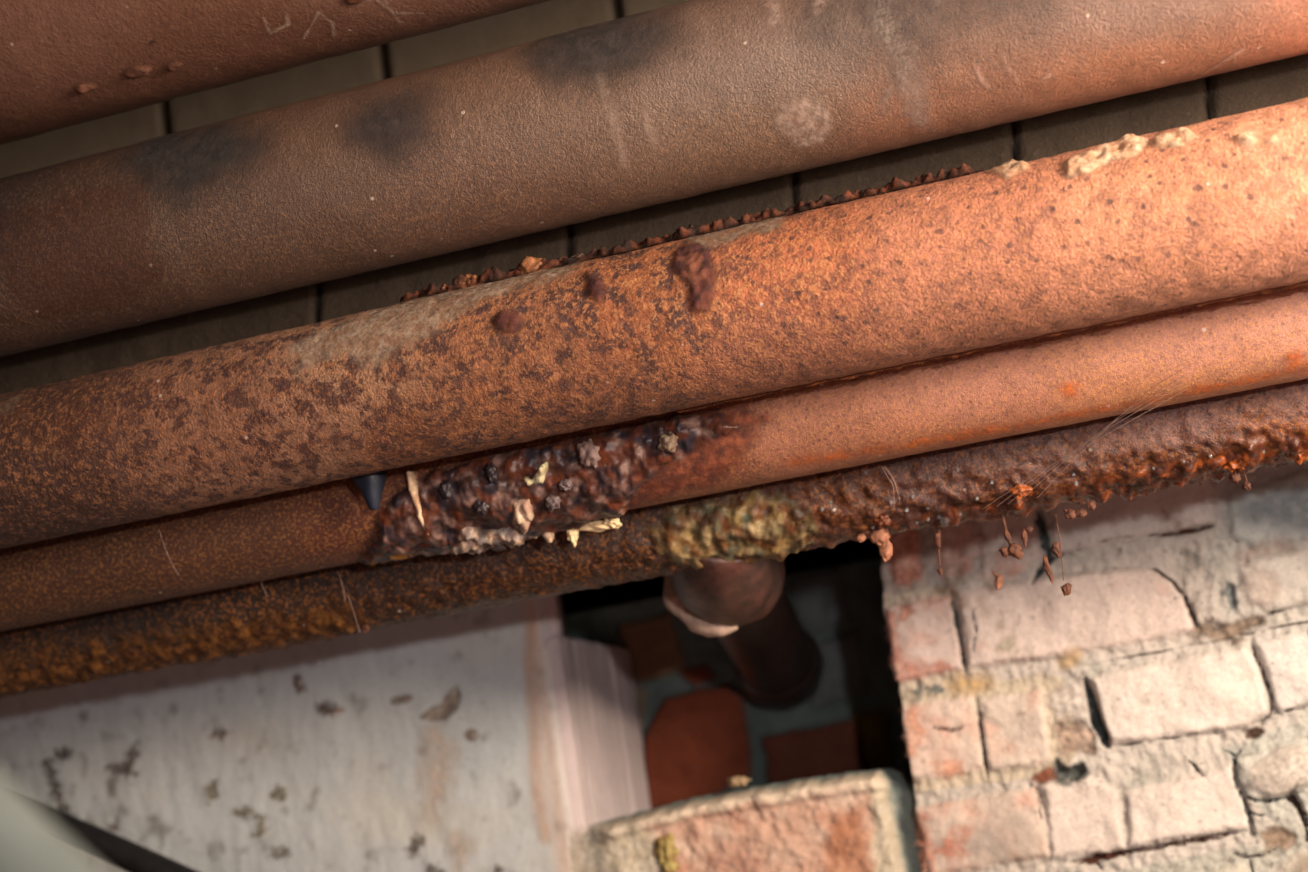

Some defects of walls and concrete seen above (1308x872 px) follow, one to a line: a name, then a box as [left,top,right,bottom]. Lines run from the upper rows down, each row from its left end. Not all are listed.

rust [399,163,984,312]
efflorescence [291,266,568,366]
rust [493,310,522,333]
peeling [650,490,817,571]
rust [856,433,1308,596]